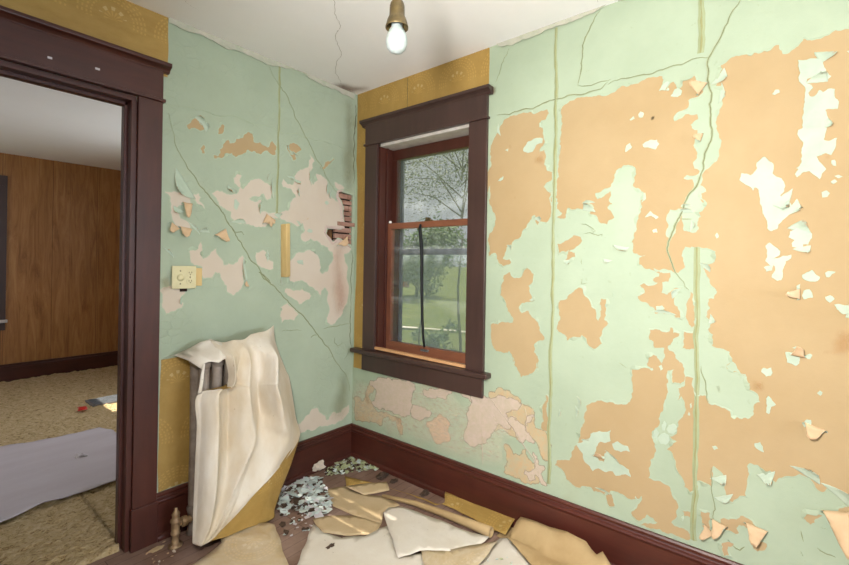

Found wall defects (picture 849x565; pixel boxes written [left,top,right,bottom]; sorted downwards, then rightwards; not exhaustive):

peeling [160,285,186,316]
peeling [164,115,355,326]
crack [168,113,353,390]
crack [270,0,356,192]
peeling [298,27,849,560]
crack [499,0,741,290]
crack [709,468,717,528]